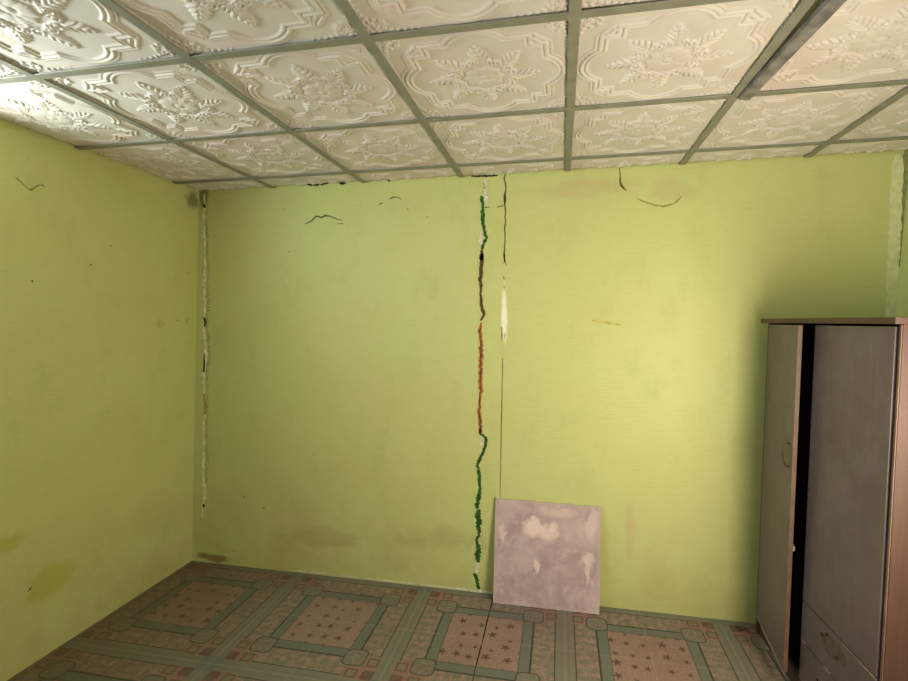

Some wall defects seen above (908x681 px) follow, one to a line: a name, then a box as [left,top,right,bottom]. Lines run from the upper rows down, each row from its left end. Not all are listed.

crack [305,214,343,224]
crack [472,174,509,681]
leakage [18,549,93,612]